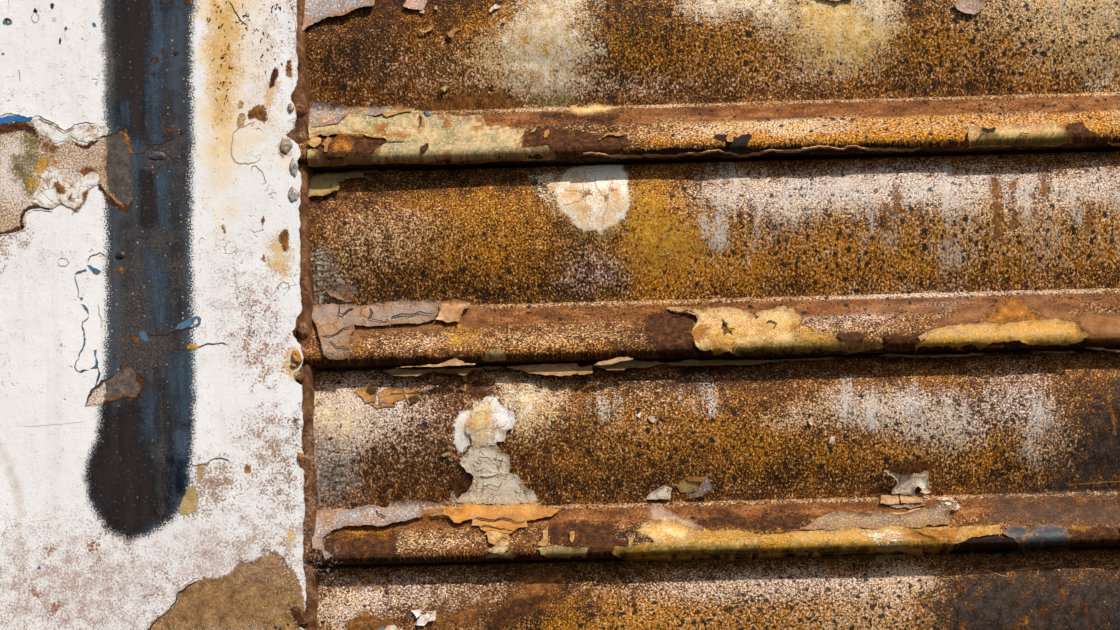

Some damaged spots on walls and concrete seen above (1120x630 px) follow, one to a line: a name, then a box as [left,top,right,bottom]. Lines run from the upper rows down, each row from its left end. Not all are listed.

peeling [0,112,136,236]
corrosion [278,103,303,203]
peeling [307,100,634,241]
corrosion [415,88,919,161]
corrosion [639,309,704,362]
peeling [667,305,884,360]
peeling [144,547,309,630]
peeling [312,347,588,630]
corrosion [548,520,629,557]
corrosion [695,507,810,535]
peeling [612,470,1071,567]
corrosion [951,535,1069,630]